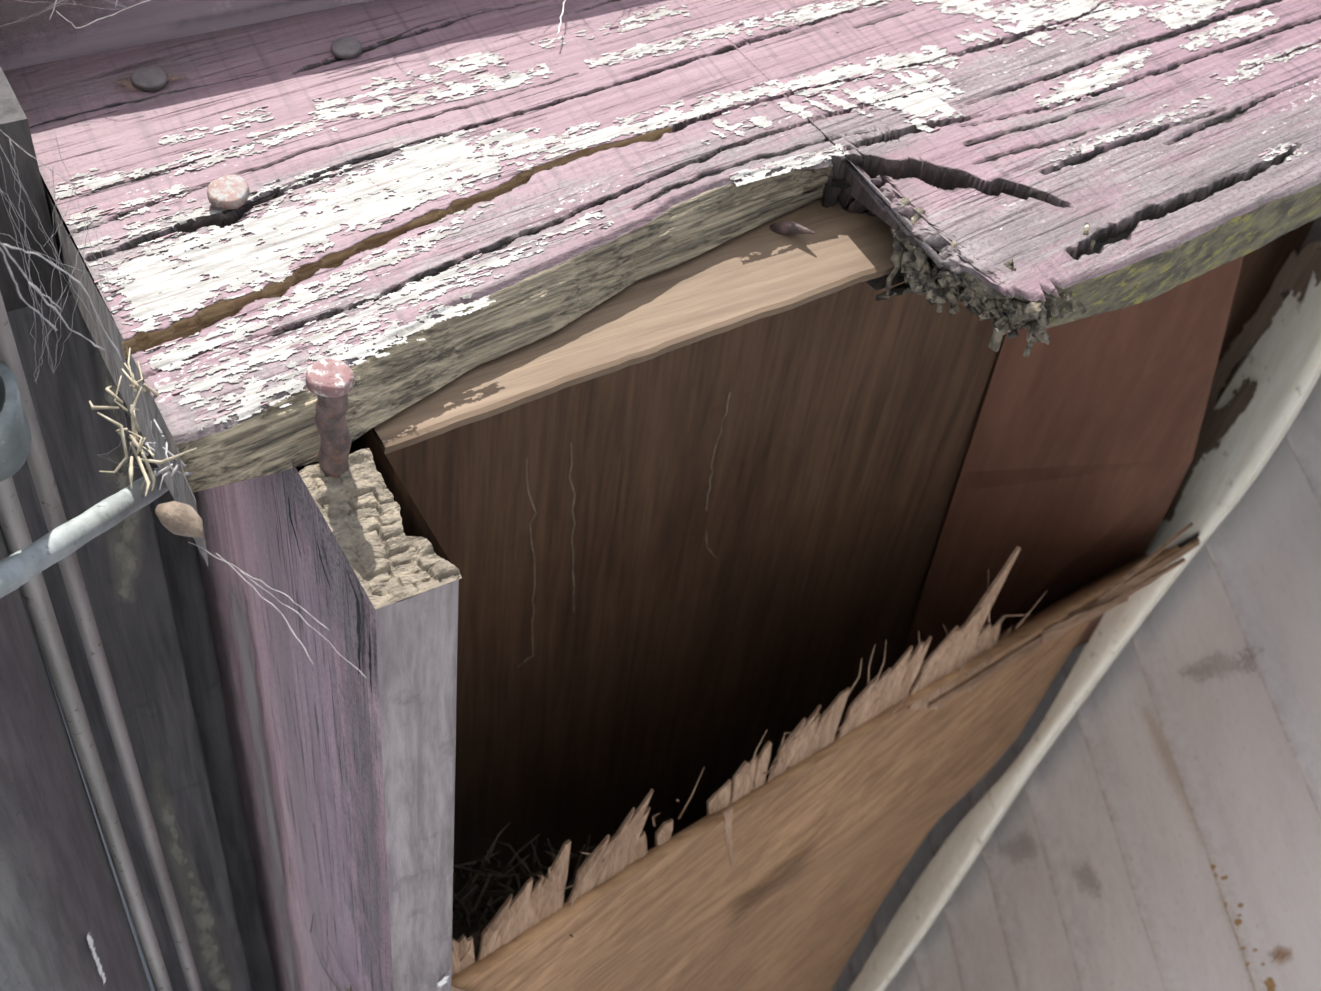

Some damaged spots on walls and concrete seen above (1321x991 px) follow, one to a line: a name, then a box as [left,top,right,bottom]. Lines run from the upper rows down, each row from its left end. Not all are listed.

crack [261,96,908,339]
spalling [54,0,1281,493]
crack [950,0,1321,175]
crack [1076,151,1295,260]
peeling [1210,37,1321,85]
peeling [1258,142,1308,161]
peeling [1162,239,1321,521]
corrosion [1224,902,1290,991]